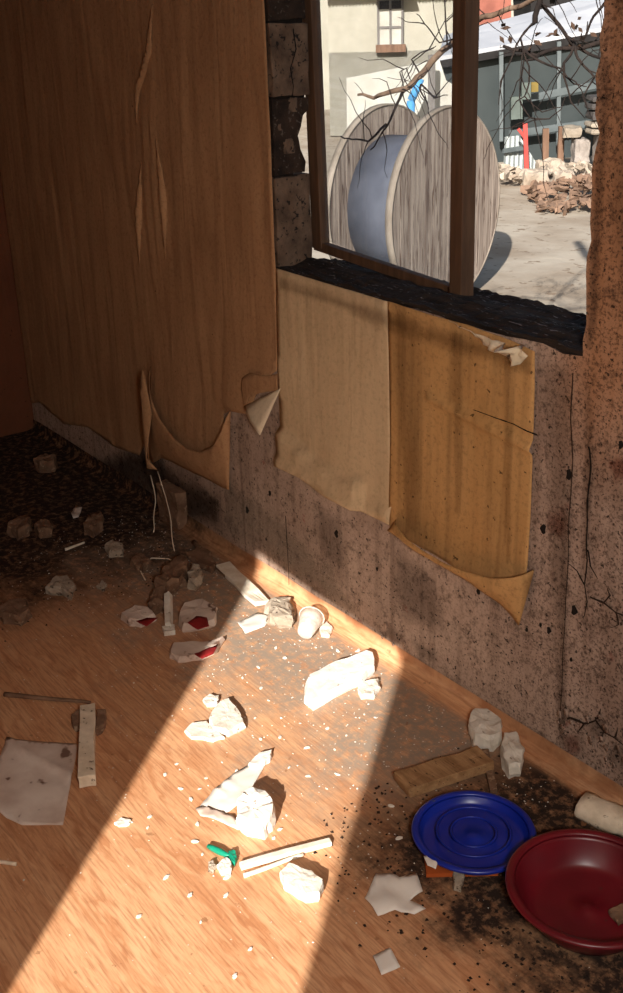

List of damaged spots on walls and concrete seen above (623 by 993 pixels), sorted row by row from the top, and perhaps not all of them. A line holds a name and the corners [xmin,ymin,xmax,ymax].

crack [559,373,623,745]